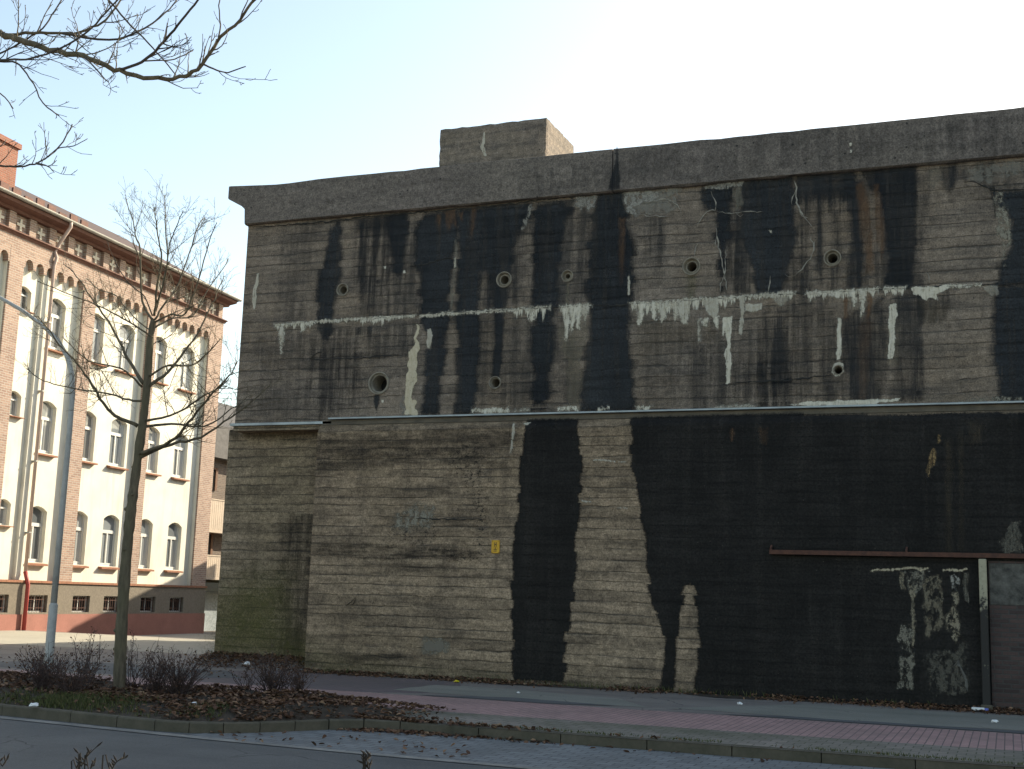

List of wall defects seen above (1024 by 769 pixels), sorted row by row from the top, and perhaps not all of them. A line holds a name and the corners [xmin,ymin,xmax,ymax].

crack [254,180,1023,326]
damp [275,148,1024,708]
peeling [897,570,969,689]